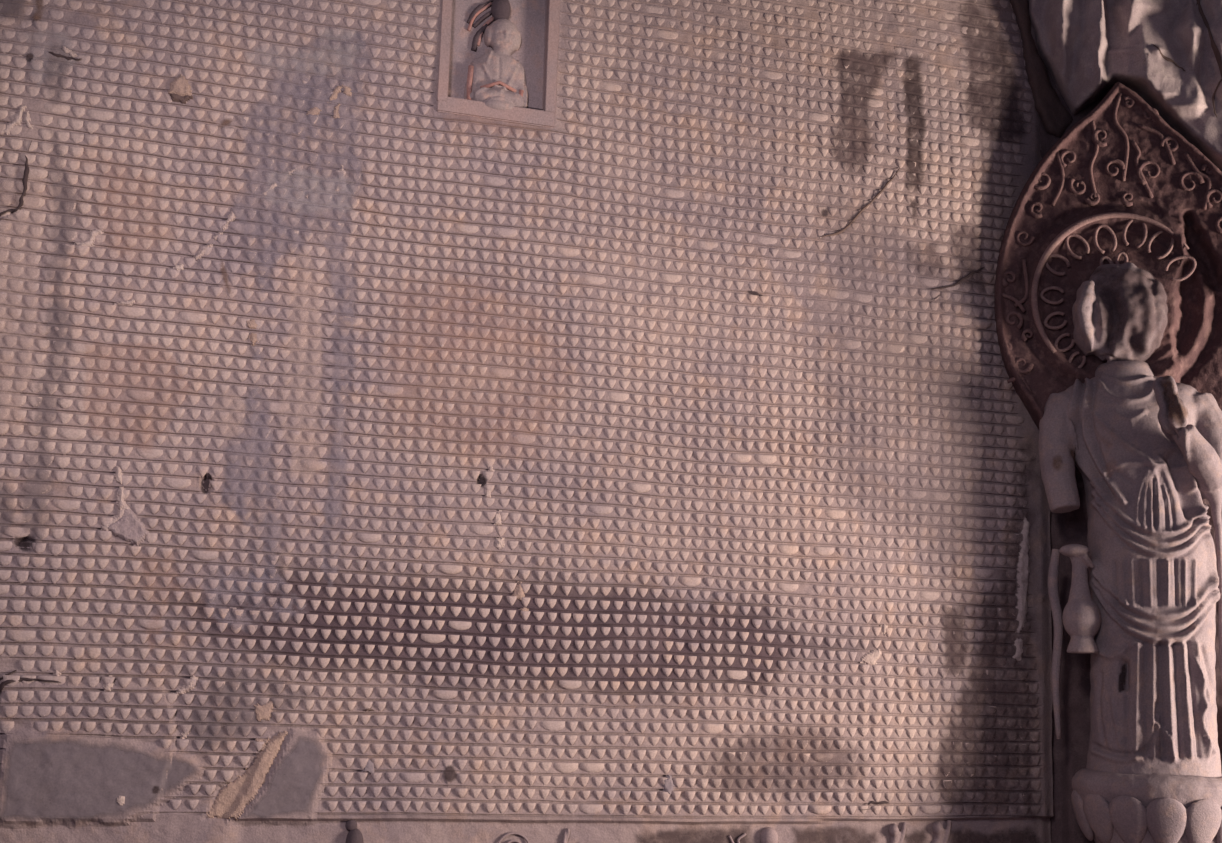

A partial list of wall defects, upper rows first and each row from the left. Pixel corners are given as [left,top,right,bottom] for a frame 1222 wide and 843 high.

crack [1144,44,1185,71]
crack [1196,0,1222,117]
crack [0,141,32,215]
crack [822,168,900,237]
leakage [236,33,368,587]
leakage [209,390,285,631]
crack [0,670,59,692]
spalling [206,700,288,821]